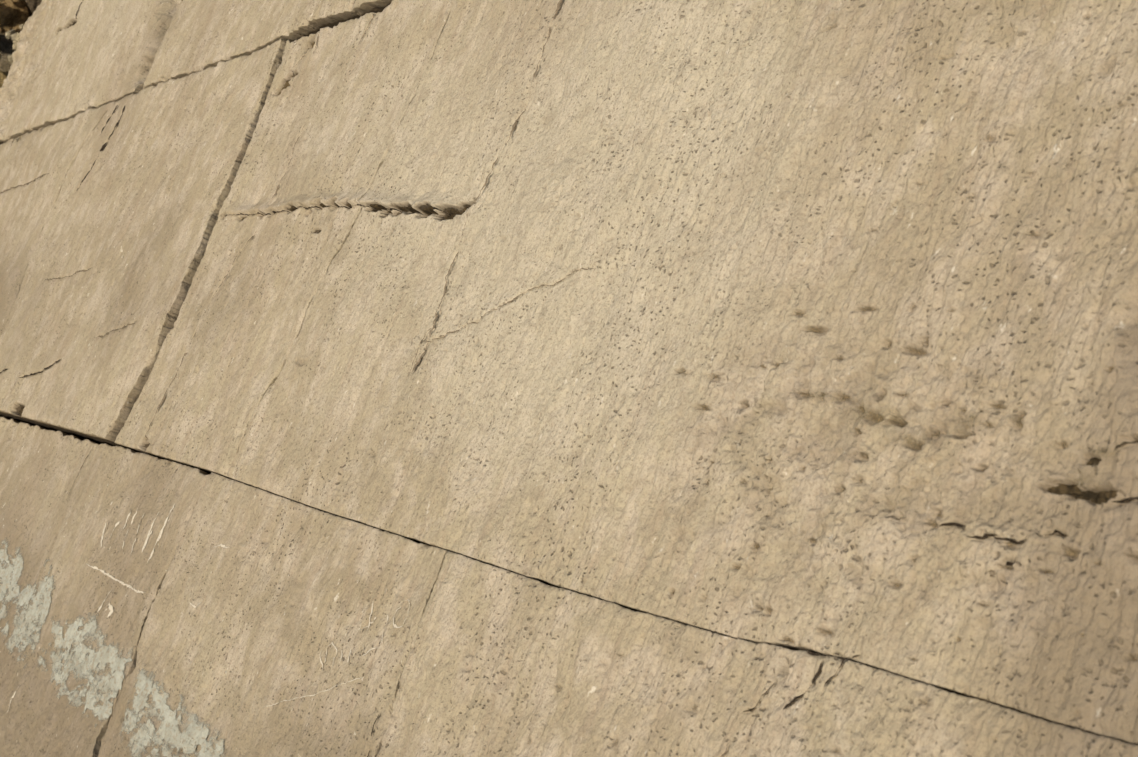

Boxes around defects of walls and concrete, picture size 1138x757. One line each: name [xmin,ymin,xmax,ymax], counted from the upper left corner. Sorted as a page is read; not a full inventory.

crack [533,0,563,79]
crack [145,111,597,439]
crack [1112,496,1138,504]
damp [0,540,224,757]